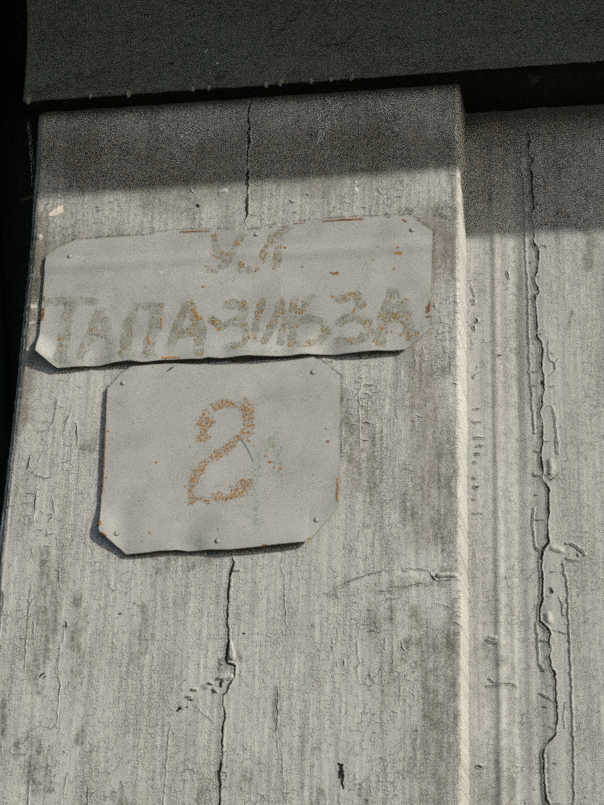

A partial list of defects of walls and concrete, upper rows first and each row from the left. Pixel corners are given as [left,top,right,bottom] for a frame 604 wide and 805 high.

crack [187,98,404,227]
crack [470,285,480,330]
crack [504,127,587,805]
crack [193,551,238,805]
crack [315,567,462,716]
crack [487,677,518,689]
crack [162,713,174,805]